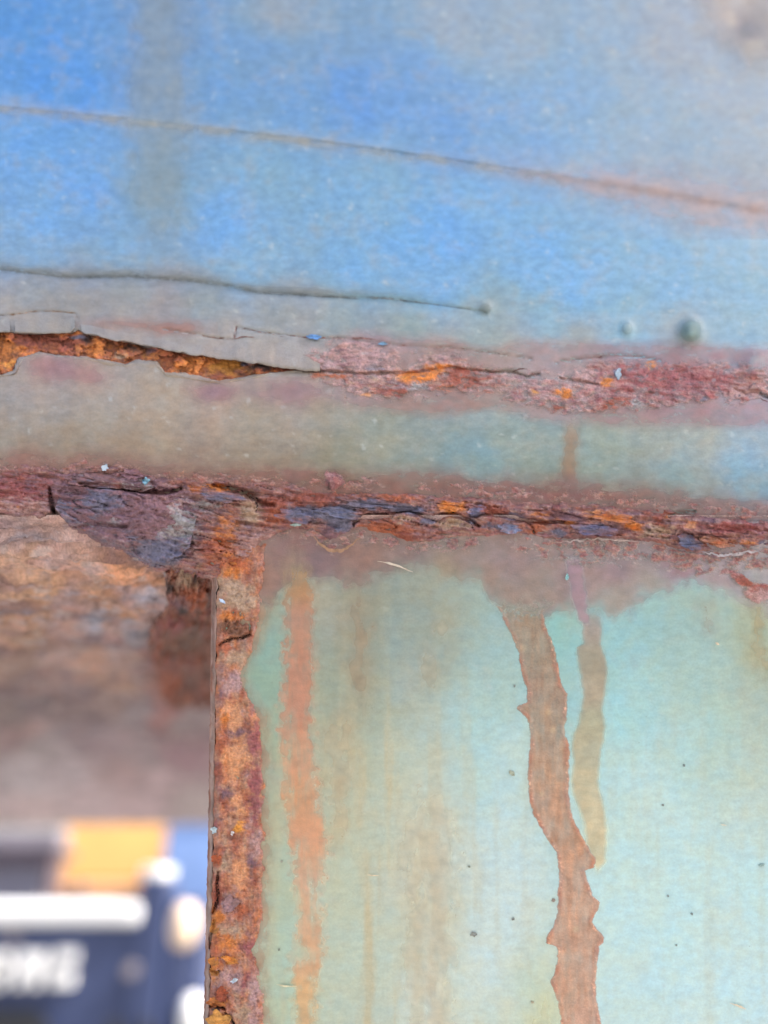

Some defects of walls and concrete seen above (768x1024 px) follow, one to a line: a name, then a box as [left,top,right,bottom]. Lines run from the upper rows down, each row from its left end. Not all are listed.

crack [0,269,483,313]
spalling [0,312,322,384]
rust [0,335,768,524]
peeling [72,464,150,488]
peeling [200,492,247,503]
peeling [274,494,487,526]
rust [148,522,768,1024]